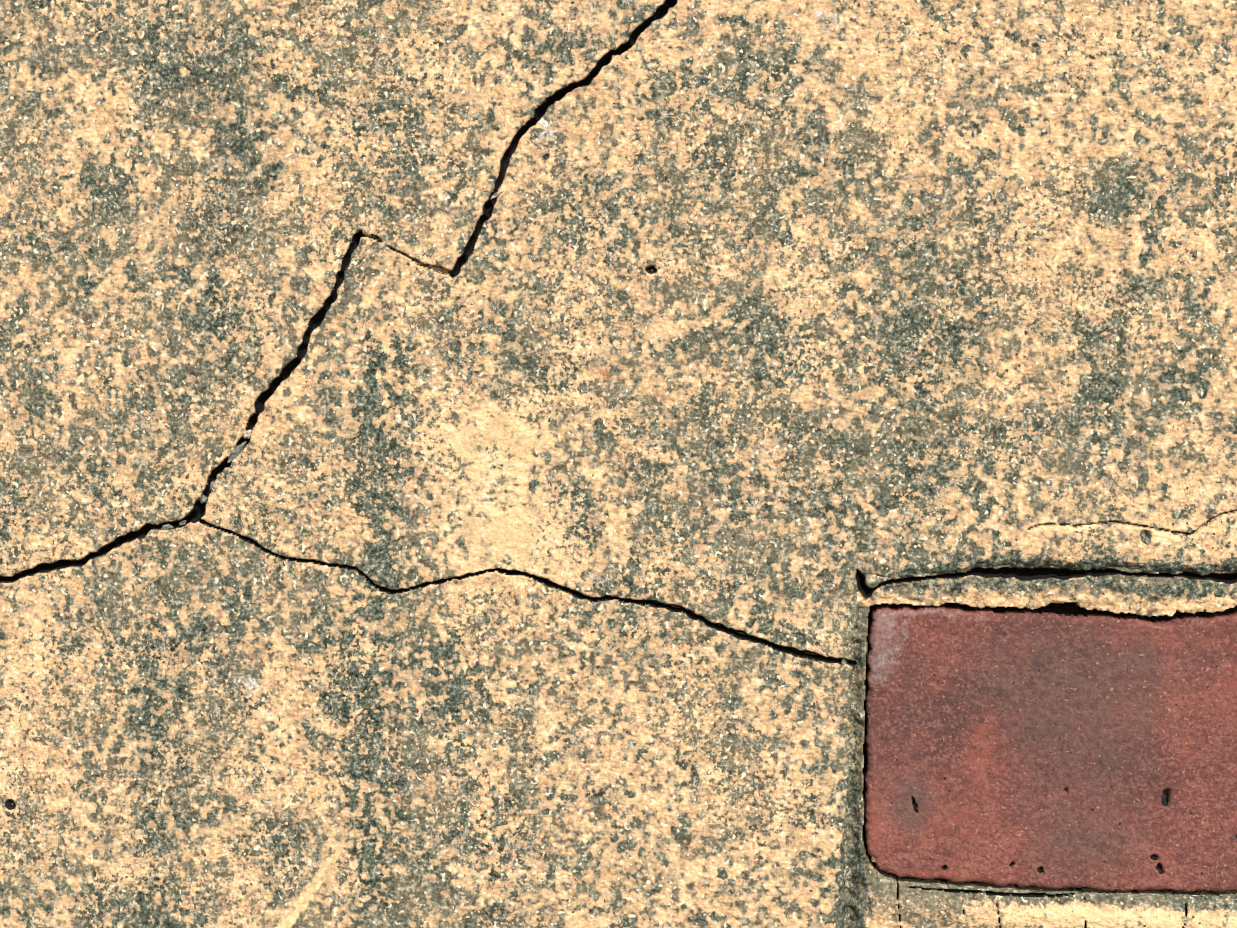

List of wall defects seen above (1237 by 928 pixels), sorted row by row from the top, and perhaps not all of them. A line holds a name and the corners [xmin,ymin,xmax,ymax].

crack [0,0,857,665]
crack [856,568,1237,928]